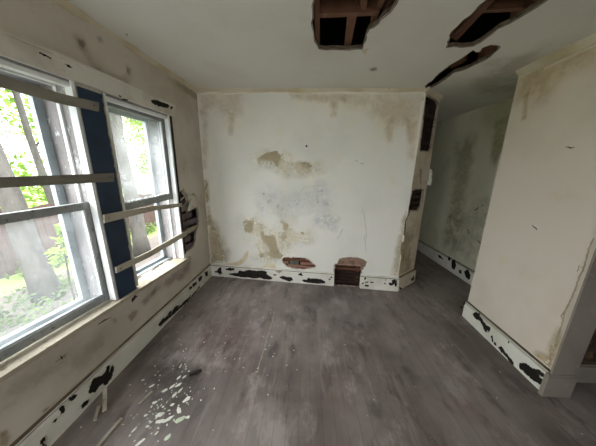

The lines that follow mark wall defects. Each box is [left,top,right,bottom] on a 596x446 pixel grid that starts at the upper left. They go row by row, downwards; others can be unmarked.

spalling [419,95,439,152]
peeling [258,150,281,168]
spalling [180,188,199,252]
spalling [158,223,374,326]
peeling [437,254,471,280]
crack [554,238,594,345]
peeling [473,312,554,385]
peeling [81,365,116,409]